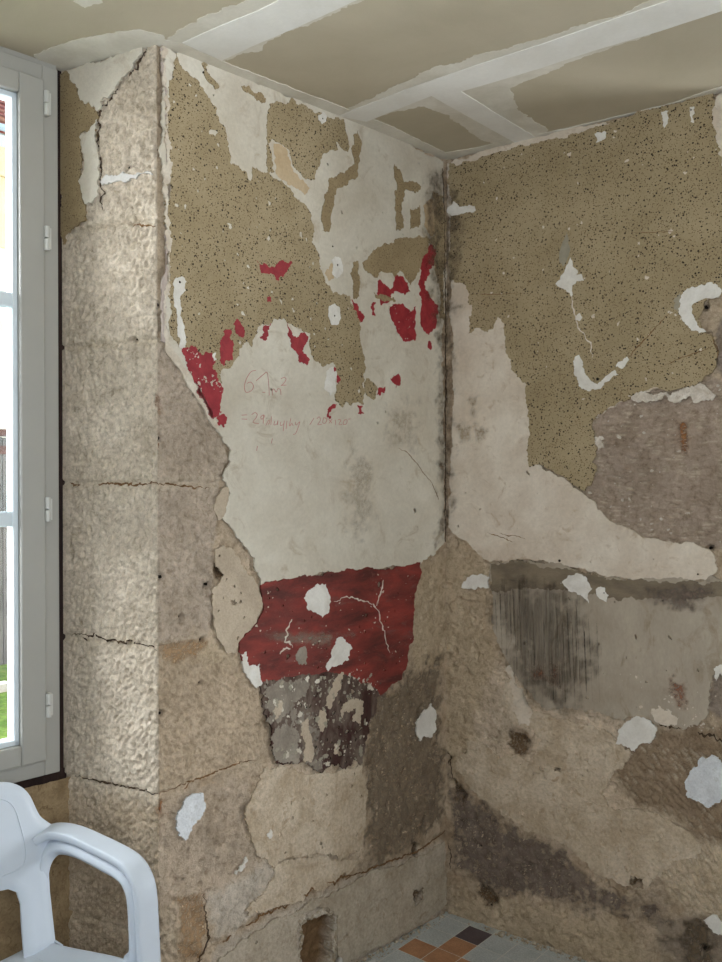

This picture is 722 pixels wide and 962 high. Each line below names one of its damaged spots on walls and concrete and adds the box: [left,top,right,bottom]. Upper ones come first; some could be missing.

peeling [60,47,143,245]
crack [70,481,209,489]
peeling [159,45,722,962]
crack [72,633,155,650]
crack [334,581,390,652]
crack [76,760,252,795]
crack [198,830,452,962]